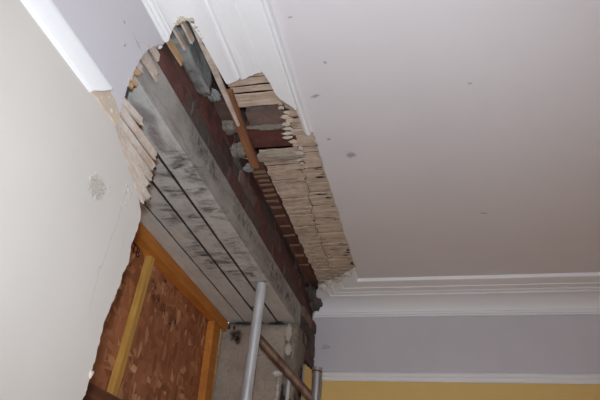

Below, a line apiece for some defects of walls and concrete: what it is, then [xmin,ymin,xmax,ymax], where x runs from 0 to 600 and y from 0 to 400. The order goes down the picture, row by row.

flaking render [91,90,123,125]
spalling [275,94,356,292]